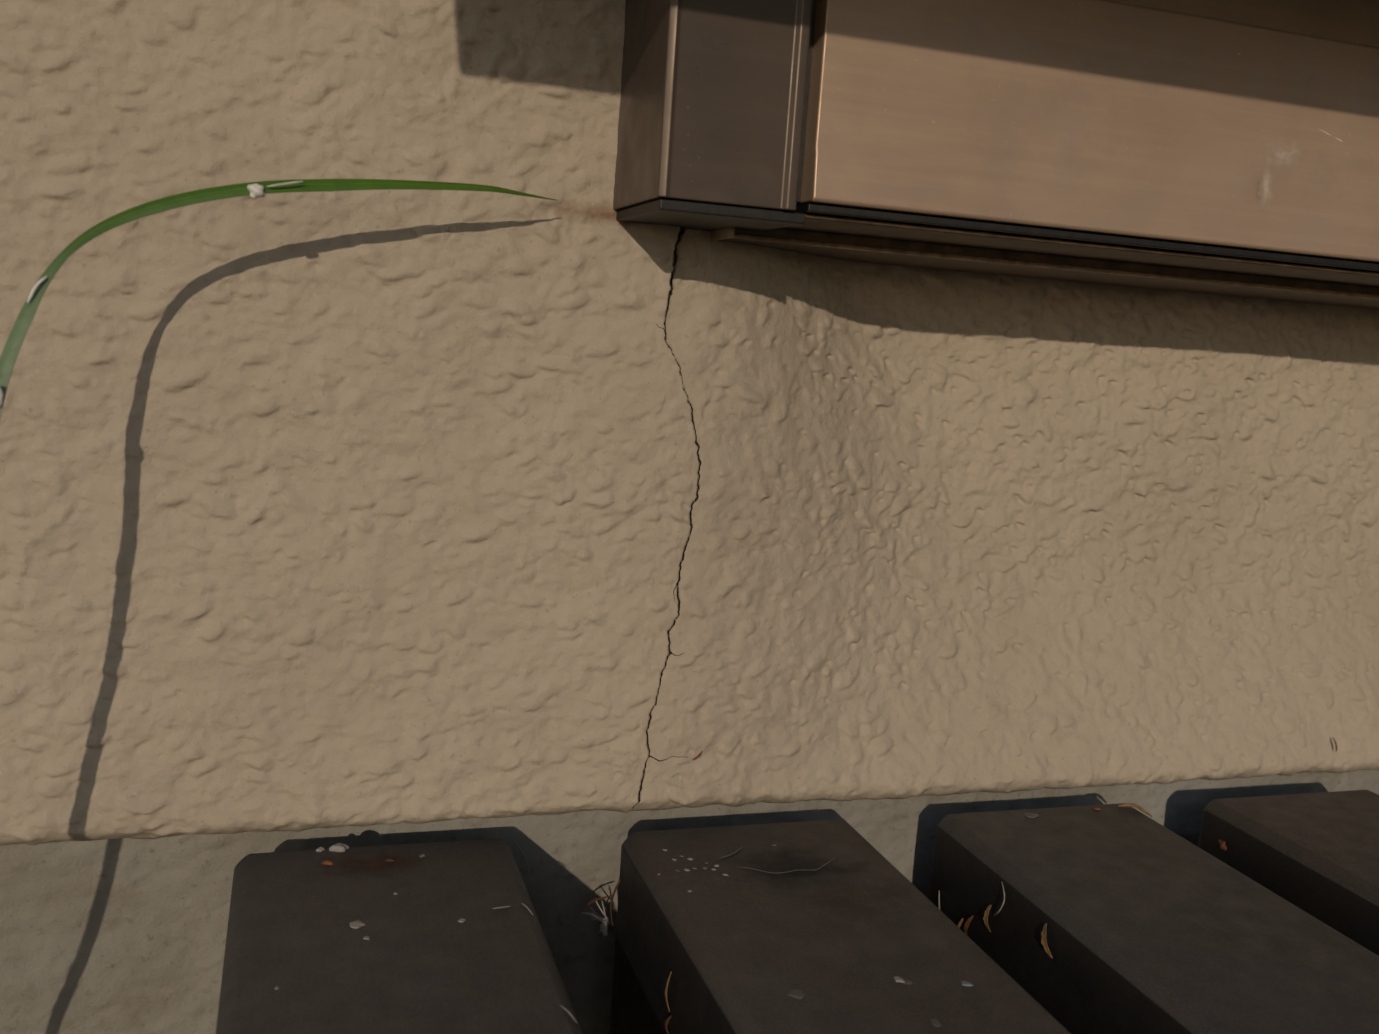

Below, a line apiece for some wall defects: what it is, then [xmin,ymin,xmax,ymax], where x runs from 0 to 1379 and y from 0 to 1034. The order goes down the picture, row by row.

crack [634,227,701,807]